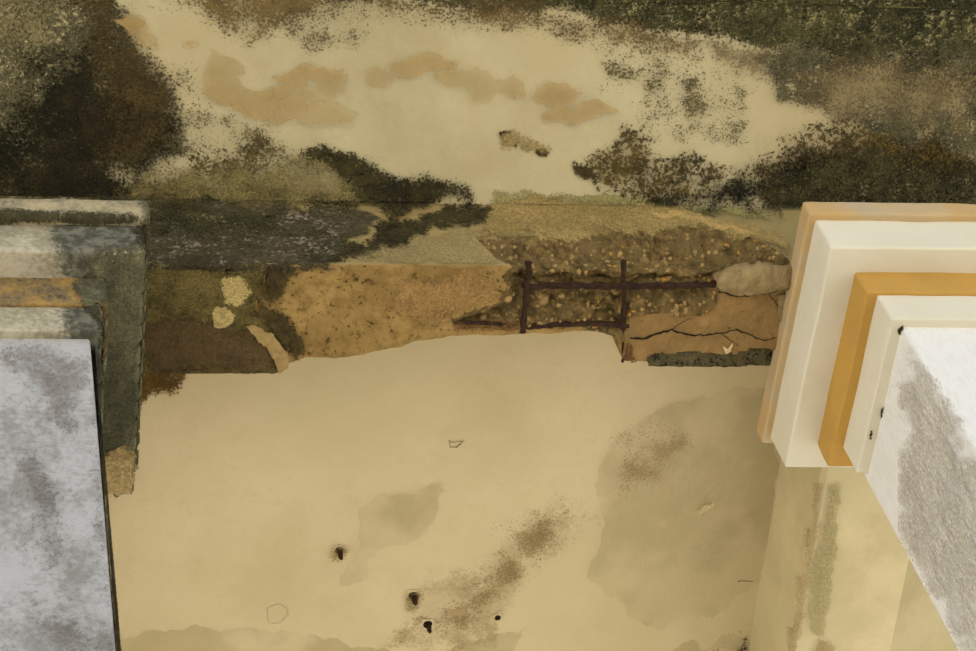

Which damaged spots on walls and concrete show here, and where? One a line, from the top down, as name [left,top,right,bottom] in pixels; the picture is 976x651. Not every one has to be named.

peeling [204,63,343,126]
peeling [391,53,456,87]
peeling [538,82,619,125]
spalling [499,129,551,157]
leakage [0,0,976,361]
peeling [212,275,254,329]
spalling [450,227,790,363]
peeling [246,325,291,374]
crack [630,319,775,344]
leakage [141,373,186,409]
leakage [0,339,122,651]